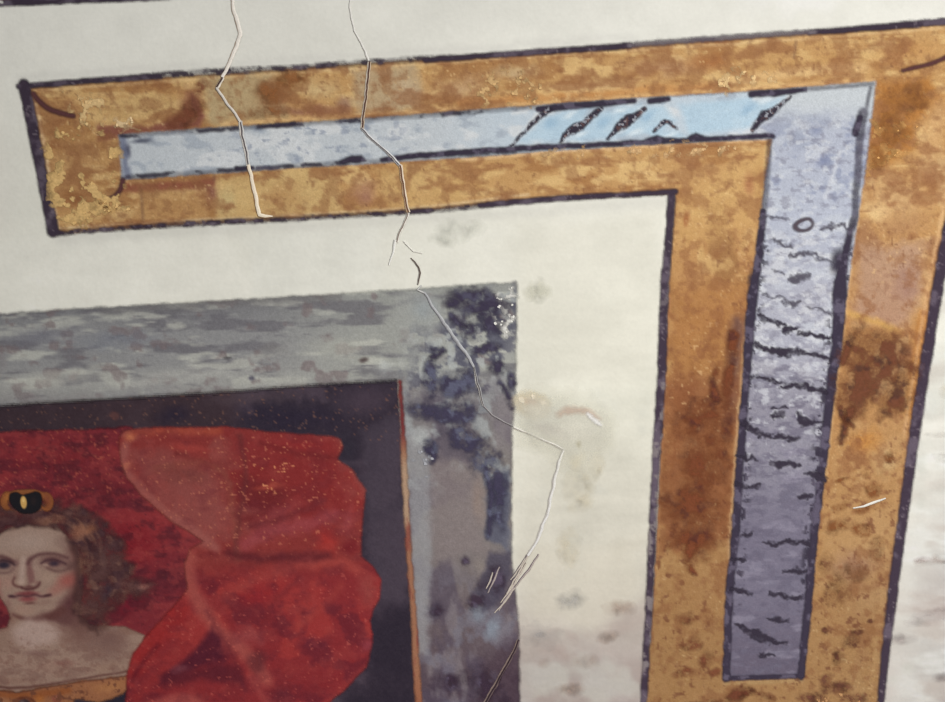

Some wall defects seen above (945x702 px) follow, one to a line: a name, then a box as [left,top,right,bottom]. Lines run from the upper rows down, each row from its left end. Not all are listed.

peeling [44,96,134,227]
crack [215,0,273,218]
crack [349,0,565,595]
leakage [408,347,508,539]
leakage [445,289,516,410]
crack [484,639,520,702]